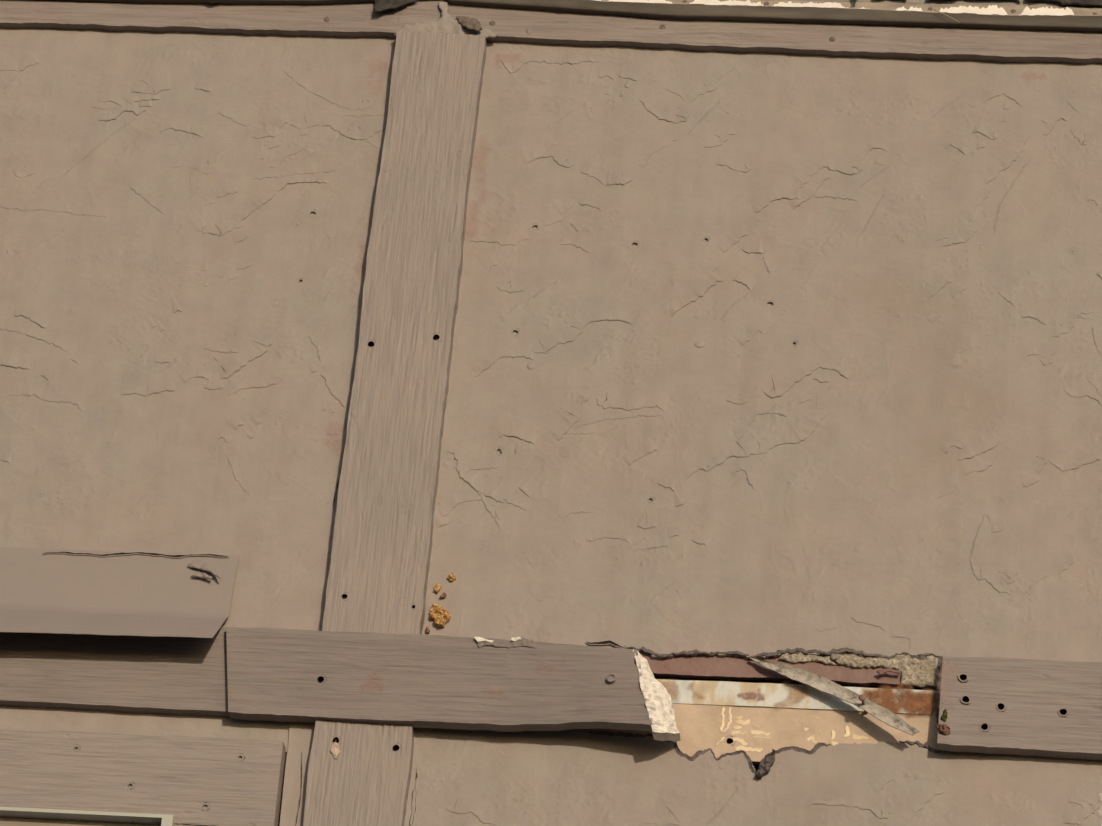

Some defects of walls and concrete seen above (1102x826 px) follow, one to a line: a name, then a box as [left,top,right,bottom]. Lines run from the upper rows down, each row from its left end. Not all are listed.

crack [496,44,600,73]
crack [90,69,172,122]
crack [639,57,742,124]
crack [751,139,890,215]
crack [473,299,637,377]
crack [434,444,539,531]
rust [662,682,677,699]
rust [738,692,765,700]
spalling [630,646,942,725]
rust [864,683,936,715]
spalling [667,740,831,779]
spalling [899,740,941,752]